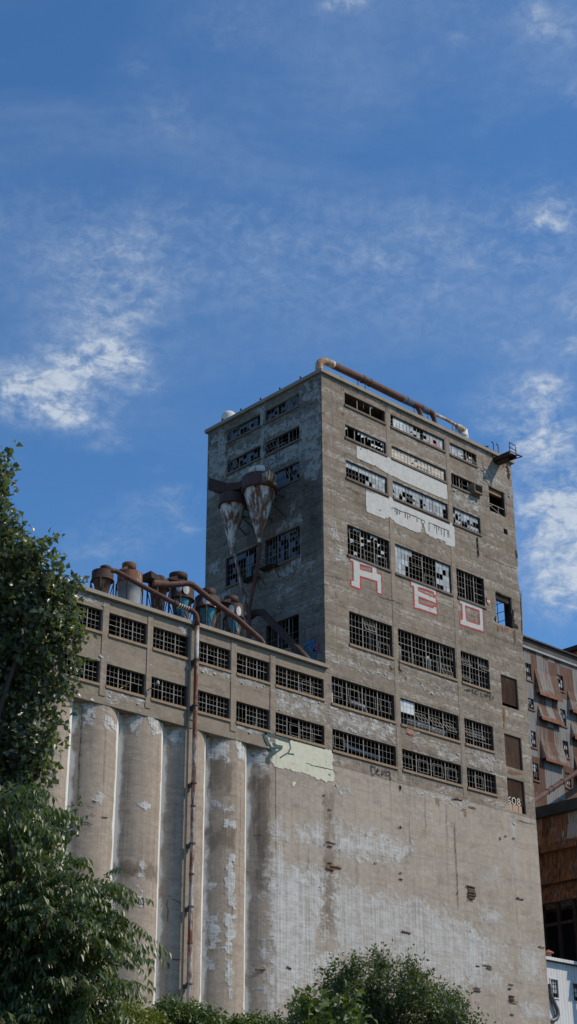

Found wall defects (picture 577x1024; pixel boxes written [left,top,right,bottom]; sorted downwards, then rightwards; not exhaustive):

peeling [357,446,481,512]
peeling [366,489,455,547]
peeling [208,725,545,1019]